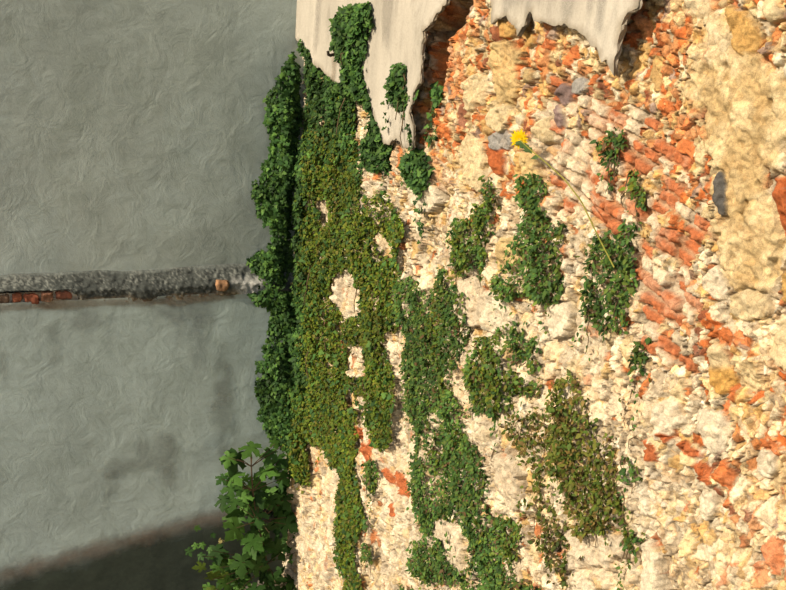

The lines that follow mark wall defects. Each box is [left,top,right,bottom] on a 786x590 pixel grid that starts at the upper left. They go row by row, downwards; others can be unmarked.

spalling [0,290,78,304]
spalling [281,0,786,590]
damp [0,507,289,590]